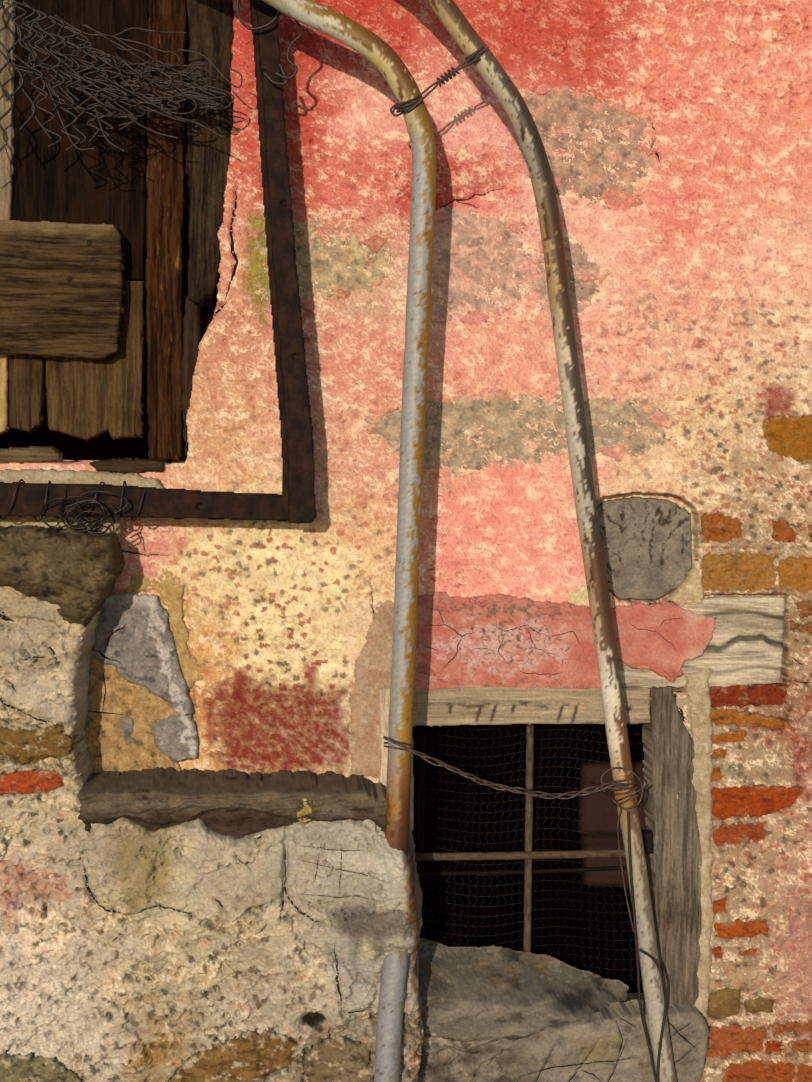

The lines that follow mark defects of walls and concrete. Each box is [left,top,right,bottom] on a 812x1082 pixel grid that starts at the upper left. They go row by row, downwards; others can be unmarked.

crack [214,187,238,316]
crack [0,677,52,723]
peeling [84,569,208,776]
crack [423,612,580,675]